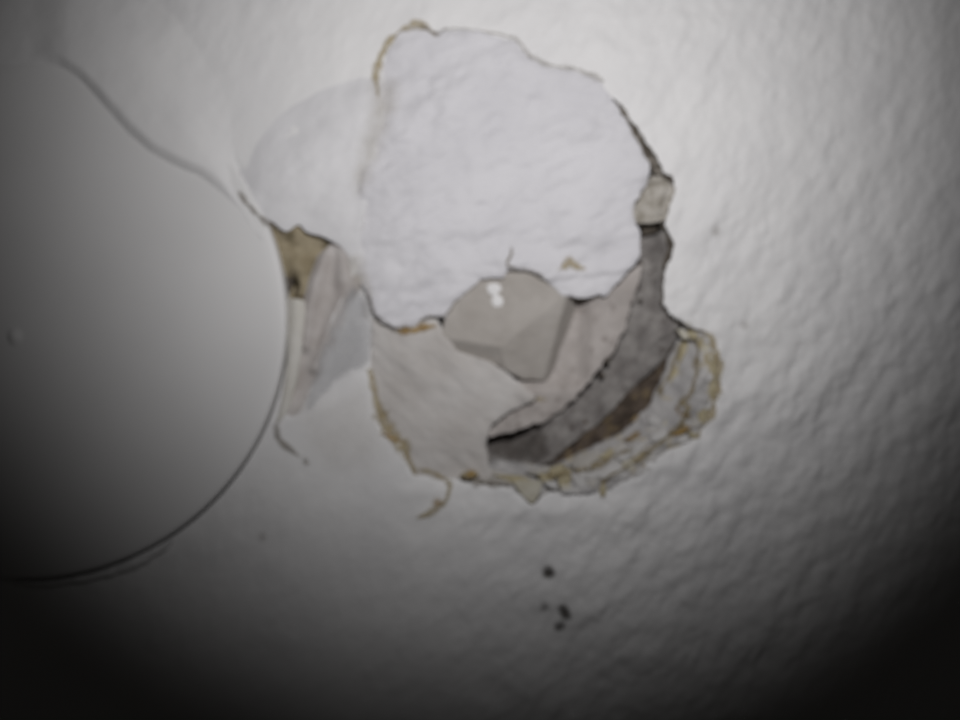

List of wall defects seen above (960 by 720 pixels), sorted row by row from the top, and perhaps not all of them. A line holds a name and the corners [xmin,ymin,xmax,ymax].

peeling [268,27,718,504]